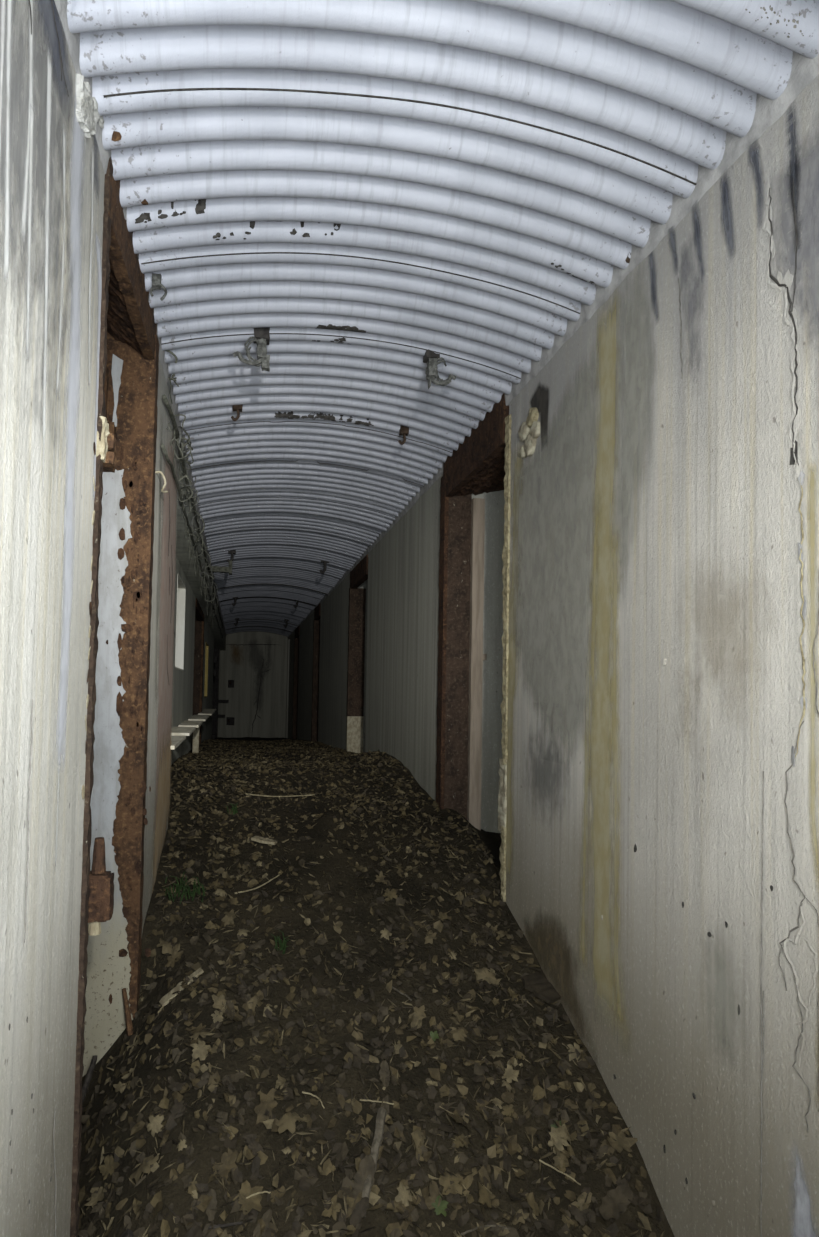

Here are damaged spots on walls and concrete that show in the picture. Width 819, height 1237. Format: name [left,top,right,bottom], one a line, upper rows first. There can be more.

peeling [135,199,206,224]
peeling [213,221,255,240]
peeling [277,221,341,237]
leakage [670,208,704,354]
leakage [721,176,734,253]
leakage [750,145,762,218]
crack [790,178,798,312]
leakage [779,111,819,328]
peeling [111,354,123,427]
leakage [506,301,647,1034]
peeling [82,445,151,1077]
crack [760,611,819,1237]